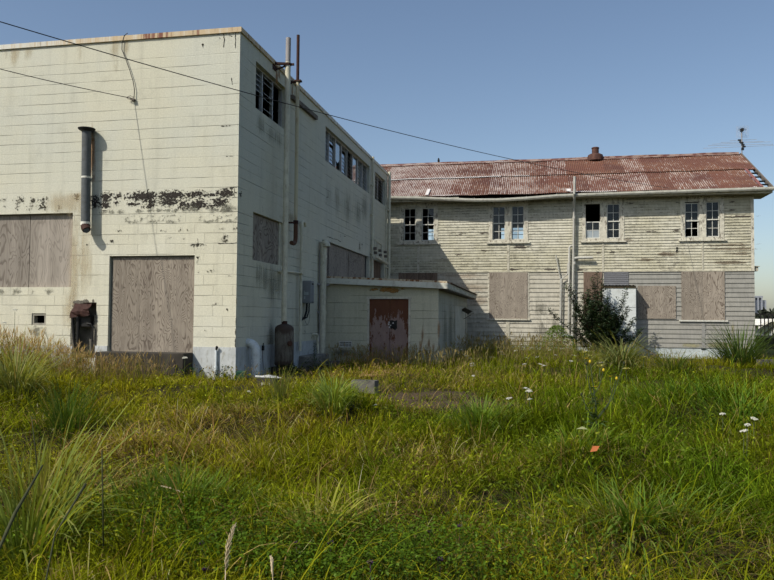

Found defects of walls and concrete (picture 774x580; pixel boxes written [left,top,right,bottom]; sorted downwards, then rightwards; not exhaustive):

peeling [91,188,237,211]